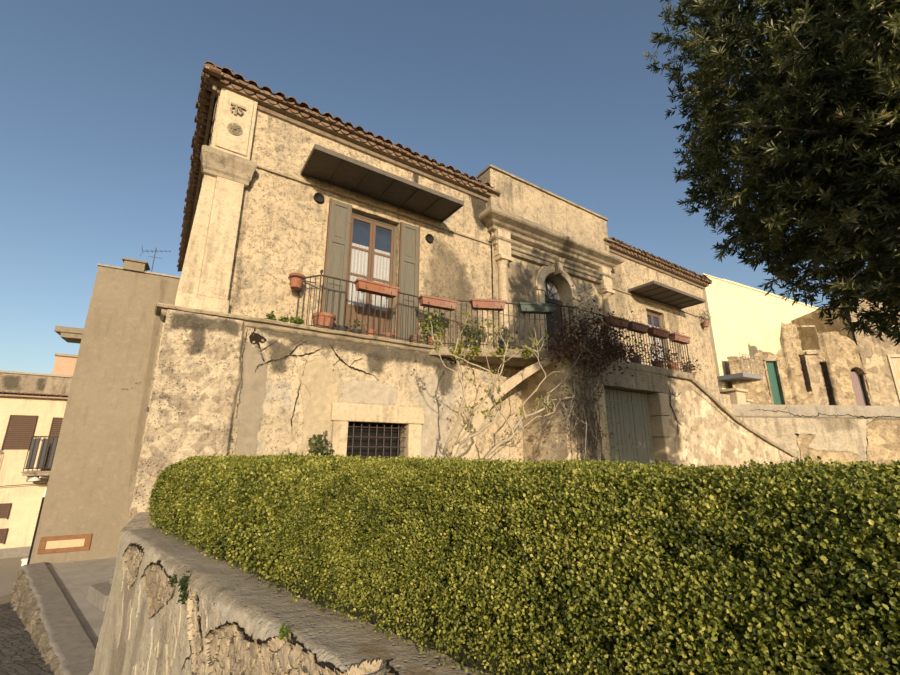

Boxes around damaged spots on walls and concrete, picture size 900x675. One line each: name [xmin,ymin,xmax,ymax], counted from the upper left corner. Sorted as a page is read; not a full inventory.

crack [236,328,378,427]
flaking render [115,546,387,675]